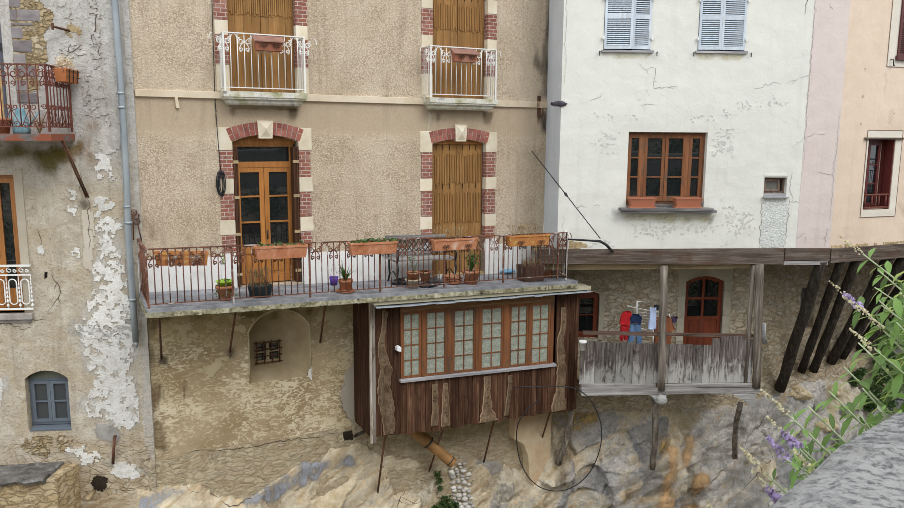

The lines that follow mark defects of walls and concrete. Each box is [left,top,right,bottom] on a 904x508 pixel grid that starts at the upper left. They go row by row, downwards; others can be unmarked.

flaking render [9,0,54,93]
flaking render [61,23,86,58]
crack [755,0,840,247]
damp [4,146,78,171]
crack [1,270,61,330]
peeling [71,196,140,430]
peeling [110,462,141,480]